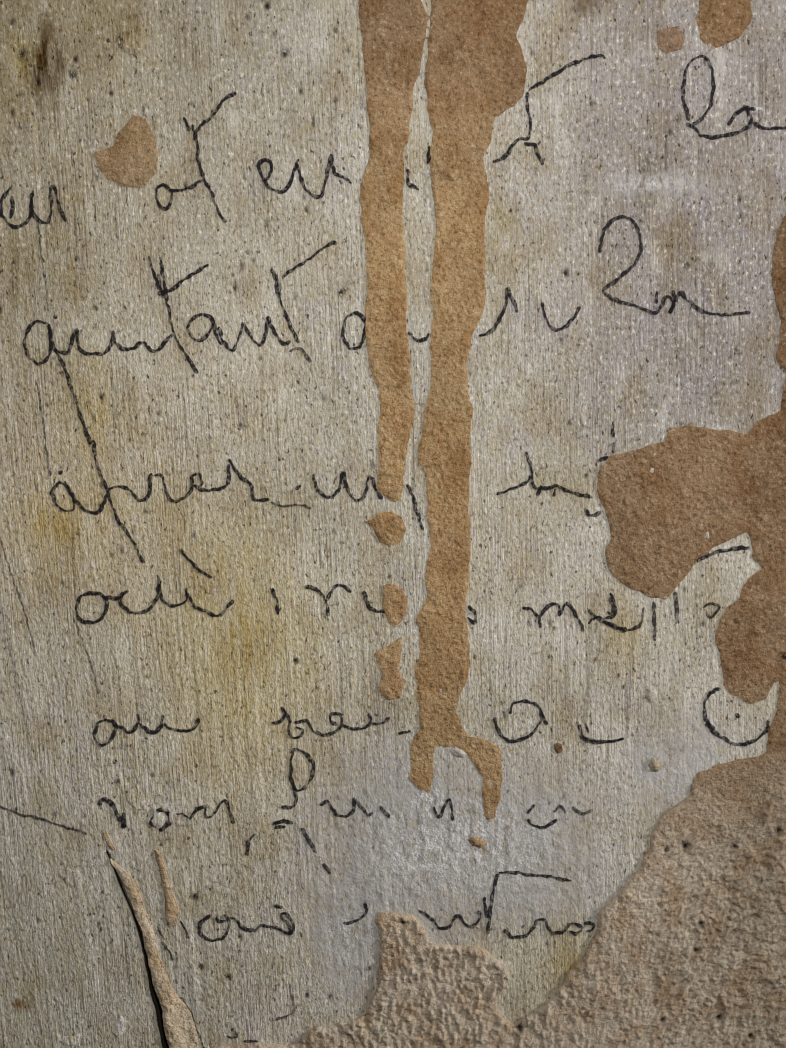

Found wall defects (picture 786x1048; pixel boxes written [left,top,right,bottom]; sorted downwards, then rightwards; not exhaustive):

peeling [656,26,685,54]
peeling [697,0,753,49]
peeling [92,115,159,187]
peeling [358,0,528,820]
spalling [213,214,786,1048]